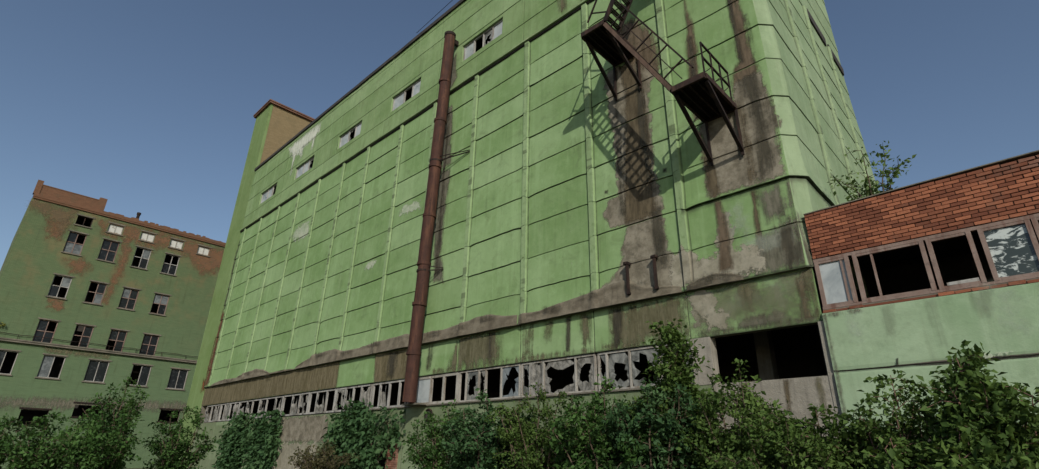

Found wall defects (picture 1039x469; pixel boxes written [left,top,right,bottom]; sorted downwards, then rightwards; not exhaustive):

leakage [426,19,860,374]
flaking render [98,219,224,304]
peeling [685,290,730,331]